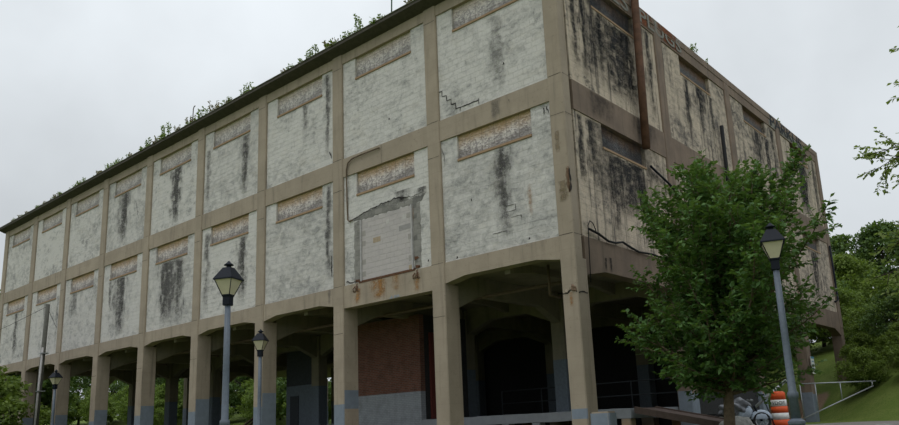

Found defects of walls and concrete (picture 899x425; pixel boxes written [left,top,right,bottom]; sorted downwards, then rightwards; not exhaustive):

water stain [569,0,654,101]
crack [439,91,479,109]
water stain [685,80,713,127]
water stain [497,154,506,206]
water stain [577,114,651,223]
water stain [752,130,778,177]
water stain [798,164,819,204]
peeling [352,192,429,293]
water stain [109,278,124,322]
water stain [160,260,183,313]